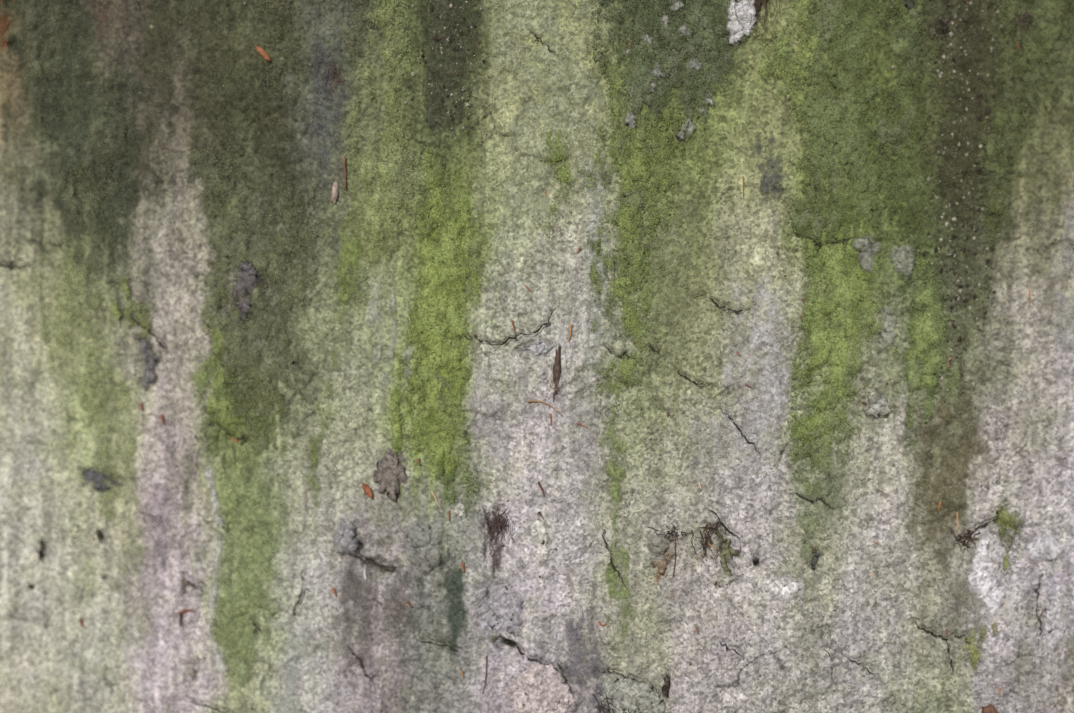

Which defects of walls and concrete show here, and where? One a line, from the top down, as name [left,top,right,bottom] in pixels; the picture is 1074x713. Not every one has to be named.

water stain [421,0,478,130]
water stain [188,32,304,238]
water stain [492,0,605,368]
crack [0,260,32,268]
water stain [11,0,181,519]
crack [457,302,557,354]
water stain [307,402,326,507]
water stain [914,395,982,560]
crack [493,637,569,685]
crack [600,668,668,703]